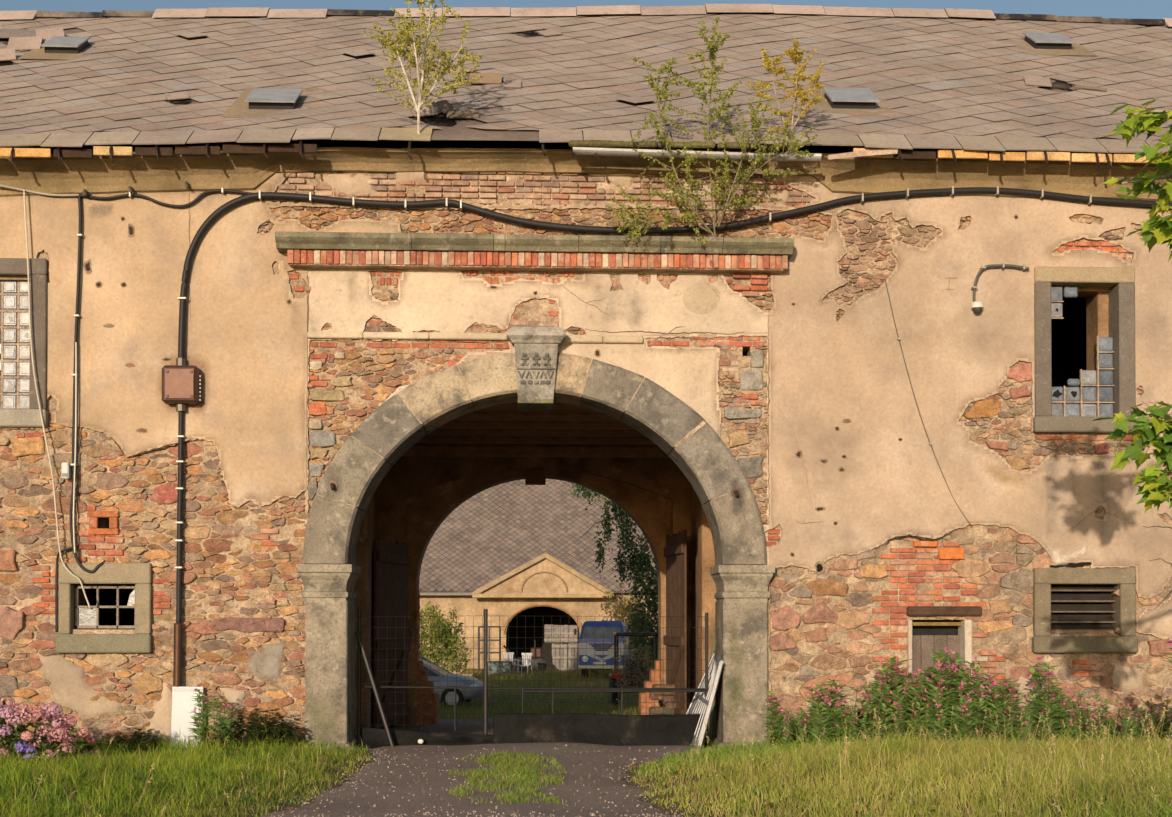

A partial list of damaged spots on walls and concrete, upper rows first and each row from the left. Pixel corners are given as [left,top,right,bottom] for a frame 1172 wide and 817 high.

spalling [83,259,102,288]
spalling [120,216,135,237]
spalling [258,171,942,322]
spalling [958,216,971,230]
spalling [1052,214,1144,263]
spalling [646,336,782,546]
spalling [958,361,1133,472]
spalling [0,269,586,748]
crack [1067,508,1172,532]
spalling [768,524,1172,744]